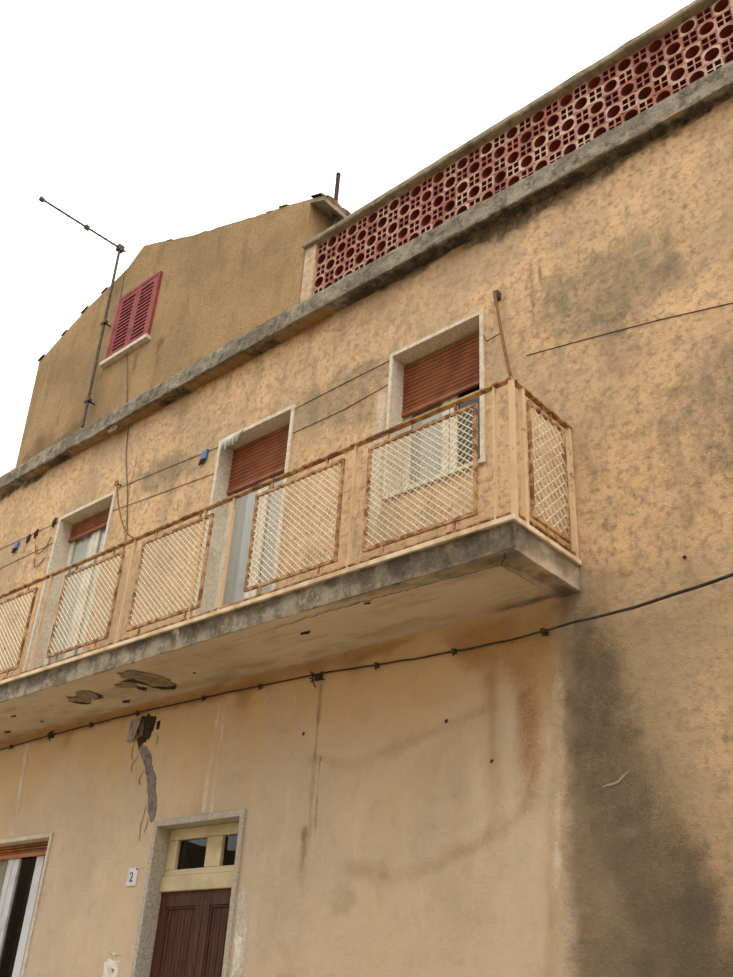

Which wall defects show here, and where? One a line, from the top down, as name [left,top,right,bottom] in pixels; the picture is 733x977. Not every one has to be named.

spalling [66,691,103,705]
spalling [114,670,177,691]
spalling [126,713,160,761]
water stain [0,517,733,977]